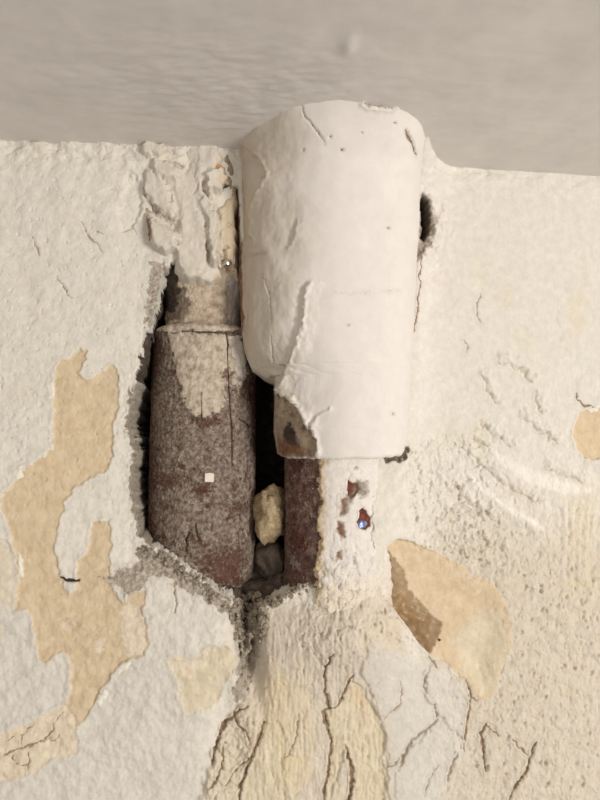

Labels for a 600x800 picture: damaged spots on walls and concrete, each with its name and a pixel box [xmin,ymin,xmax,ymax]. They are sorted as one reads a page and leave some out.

spalling [135,253,172,335]
corrosion [147,334,180,541]
corrosion [196,416,217,429]
peeling [273,392,322,459]
peeling [0,341,271,786]
corrosion [194,541,248,587]
corrosion [330,461,374,569]
spalling [378,535,523,713]
crack [205,705,267,800]
crack [282,653,357,800]
crack [382,647,441,775]
crack [423,677,540,800]